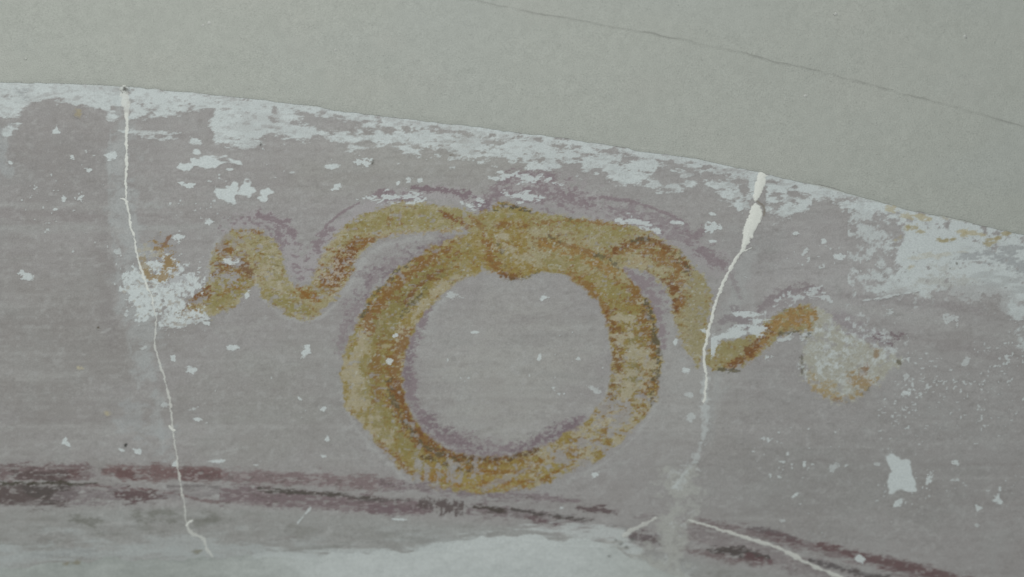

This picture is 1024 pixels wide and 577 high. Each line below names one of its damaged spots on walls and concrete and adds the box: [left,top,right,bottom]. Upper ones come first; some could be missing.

crack [462,0,1024,128]
peeling [0,82,1024,397]
crack [118,86,214,557]
crack [671,172,769,489]
crack [622,516,658,538]
crack [687,519,844,577]
peeling [871,453,934,508]